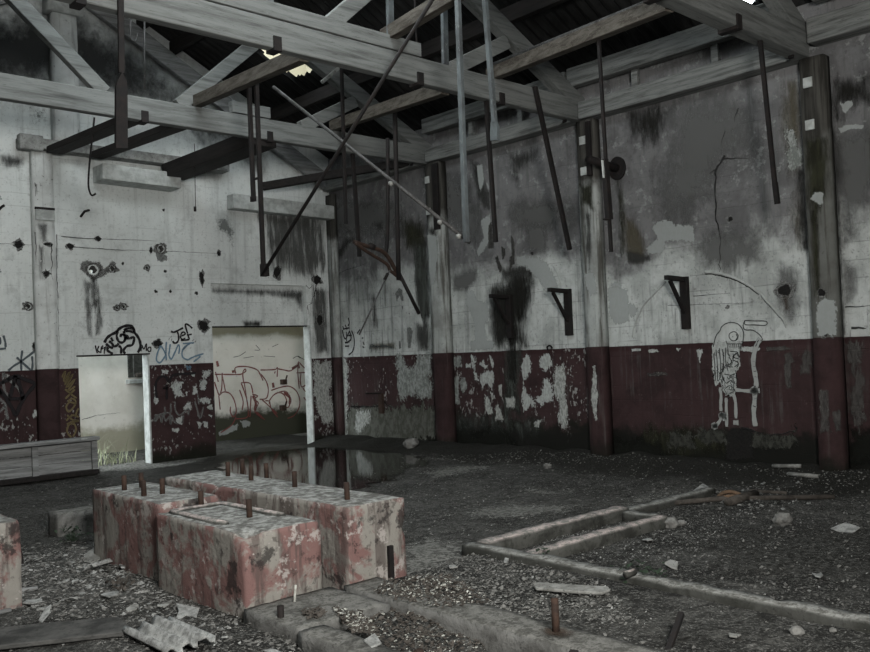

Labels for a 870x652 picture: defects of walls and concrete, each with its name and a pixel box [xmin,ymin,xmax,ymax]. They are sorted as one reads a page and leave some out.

peeling [646,220,695,255]
crack [712,108,748,272]
peeling [162,370,213,433]
peeling [219,420,250,436]
peeling [311,327,436,440]
water stain [454,267,541,446]
peeling [454,289,570,429]